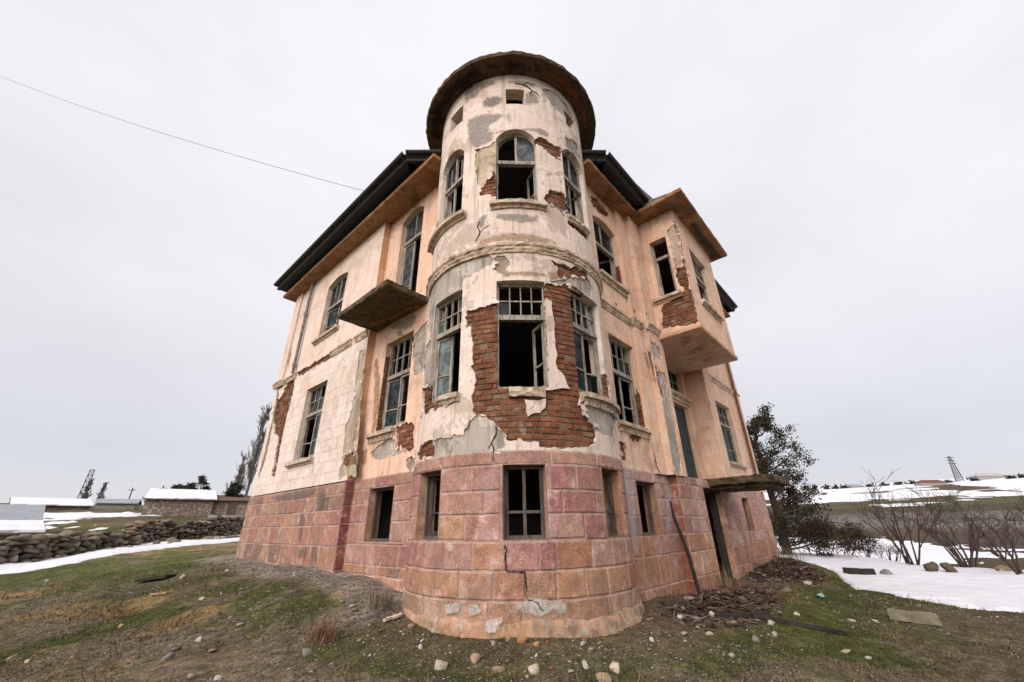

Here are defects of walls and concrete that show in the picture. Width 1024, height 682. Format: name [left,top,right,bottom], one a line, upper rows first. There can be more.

peeling [474,142,499,197]
flaking render [535,136,580,160]
flaking render [544,189,589,240]
flaking render [661,220,698,329]
flaking render [272,355,331,476]
peeling [339,350,366,480]
flaking render [371,256,645,471]
crack [504,545,544,611]